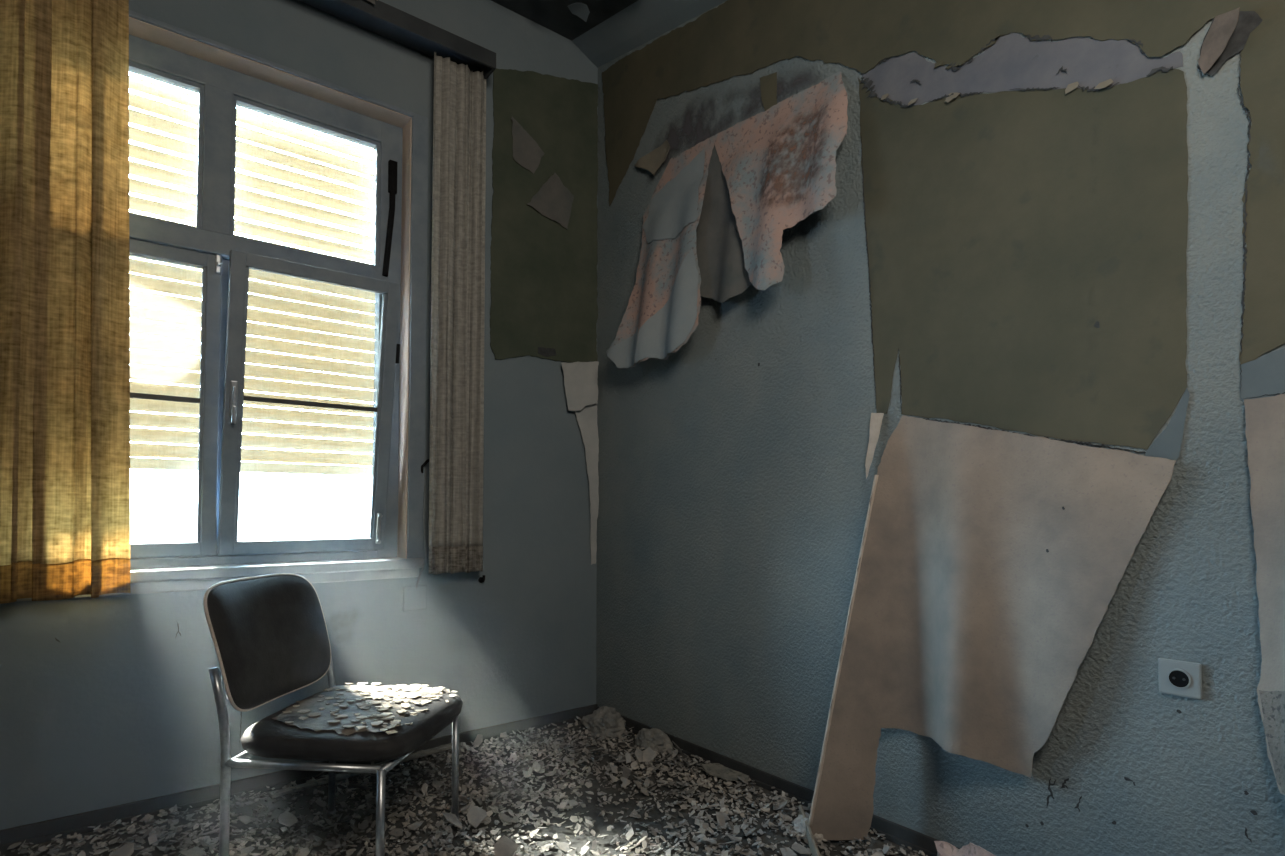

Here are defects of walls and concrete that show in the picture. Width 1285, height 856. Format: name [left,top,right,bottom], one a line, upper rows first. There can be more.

flaking render [860,33,1183,108]
peeling [606,145,752,368]
flaking render [1239,348,1285,399]